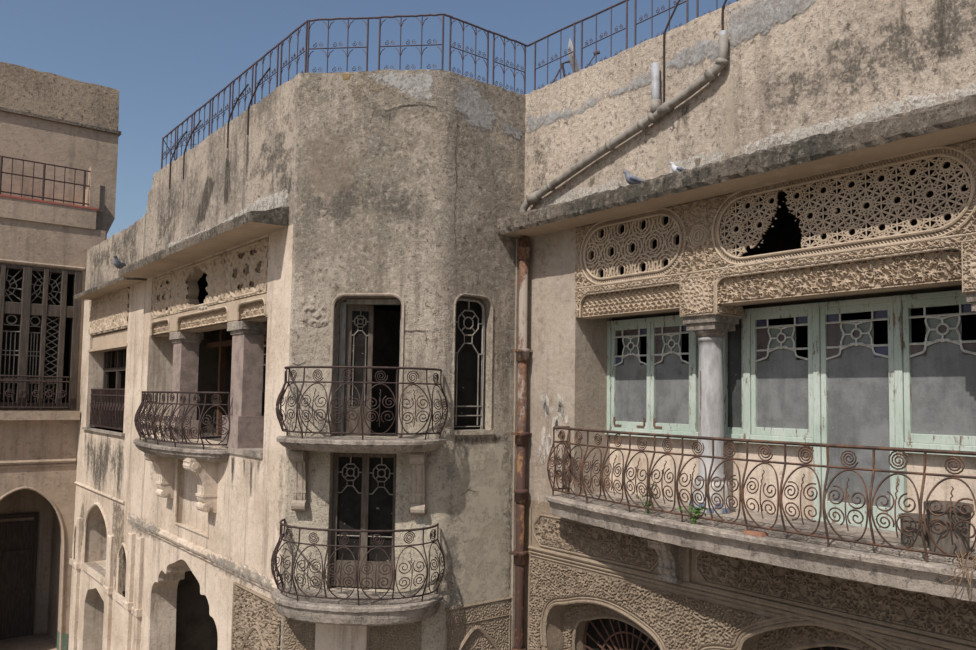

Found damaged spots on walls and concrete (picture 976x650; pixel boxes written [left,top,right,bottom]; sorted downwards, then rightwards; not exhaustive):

damp [764,0,976,113]
crack [370,103,436,126]
crack [453,117,461,244]
damp [85,437,123,495]